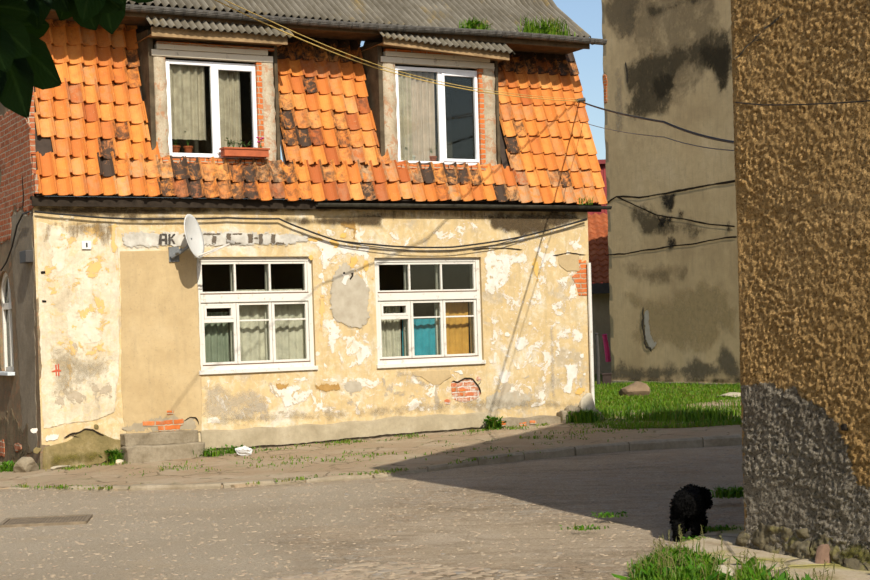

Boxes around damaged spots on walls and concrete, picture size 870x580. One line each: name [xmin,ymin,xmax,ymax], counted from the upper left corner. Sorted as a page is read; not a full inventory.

water stain [605,0,637,38]
water stain [628,32,732,115]
peeling [433,222,477,245]
peeling [0,110,121,463]
peeling [207,226,601,423]
spalling [122,410,197,432]